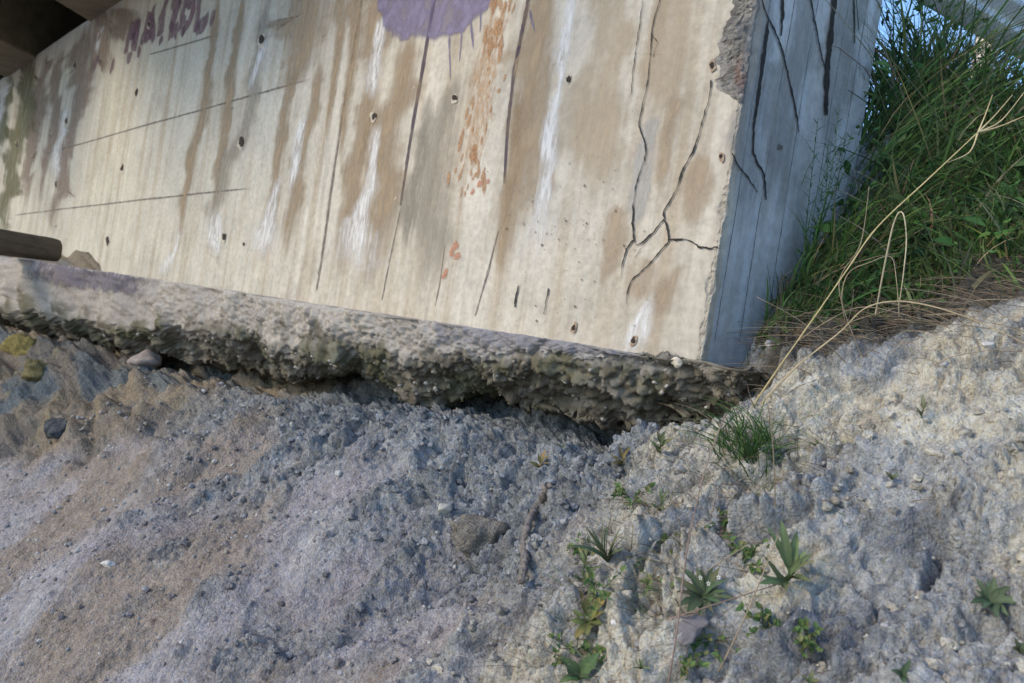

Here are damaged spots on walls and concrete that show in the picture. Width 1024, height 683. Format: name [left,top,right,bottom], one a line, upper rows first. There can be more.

water stain [0,8,137,228]
water stain [159,4,218,273]
water stain [208,0,456,260]
spalling [237,331,546,406]
rust [442,241,461,279]
rust [447,0,515,196]
water stain [499,0,574,262]
spalling [550,360,689,425]
crack [620,0,718,297]
spalling [695,0,760,411]
crack [732,0,800,199]
crack [810,0,855,115]